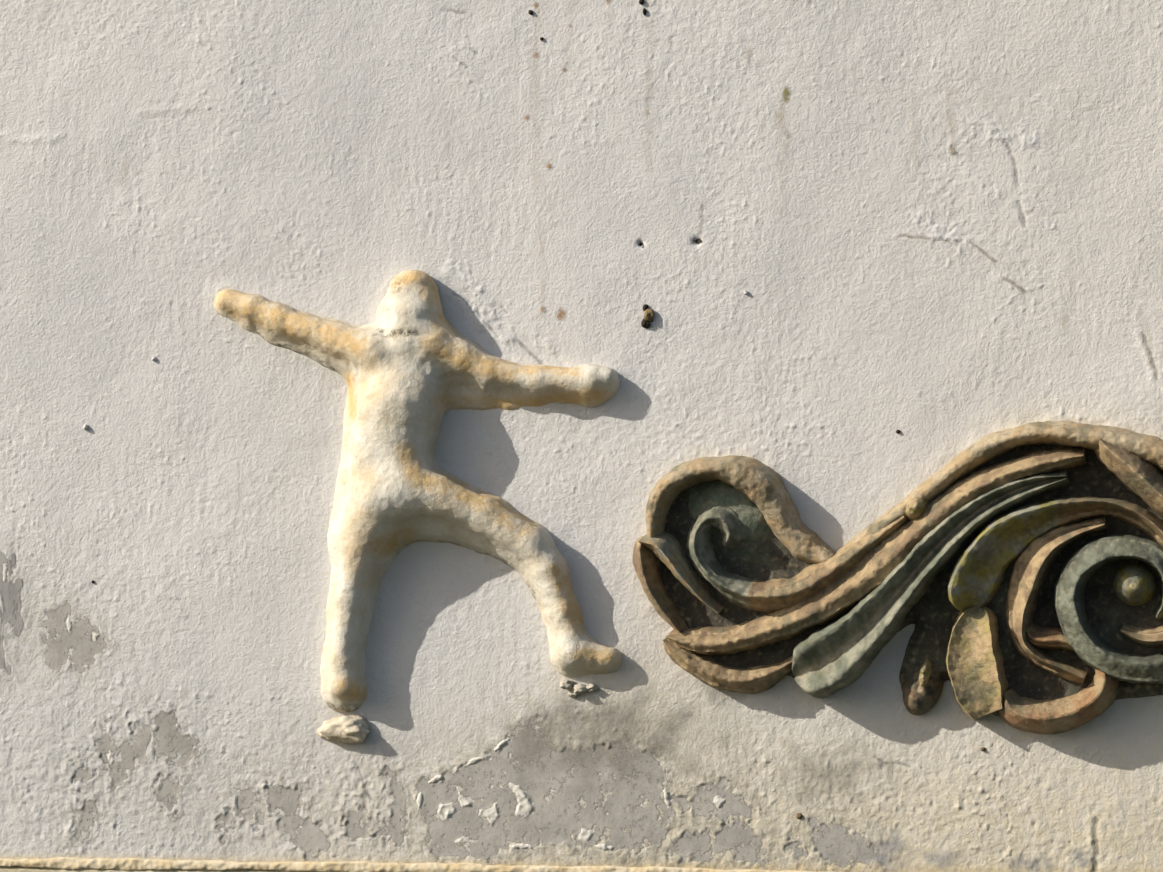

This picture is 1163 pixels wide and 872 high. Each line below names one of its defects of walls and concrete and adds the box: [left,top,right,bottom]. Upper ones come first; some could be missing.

peeling [0,551,23,675]
peeling [41,600,108,673]
peeling [73,801,102,842]
peeling [69,709,201,819]
peeling [341,718,768,867]